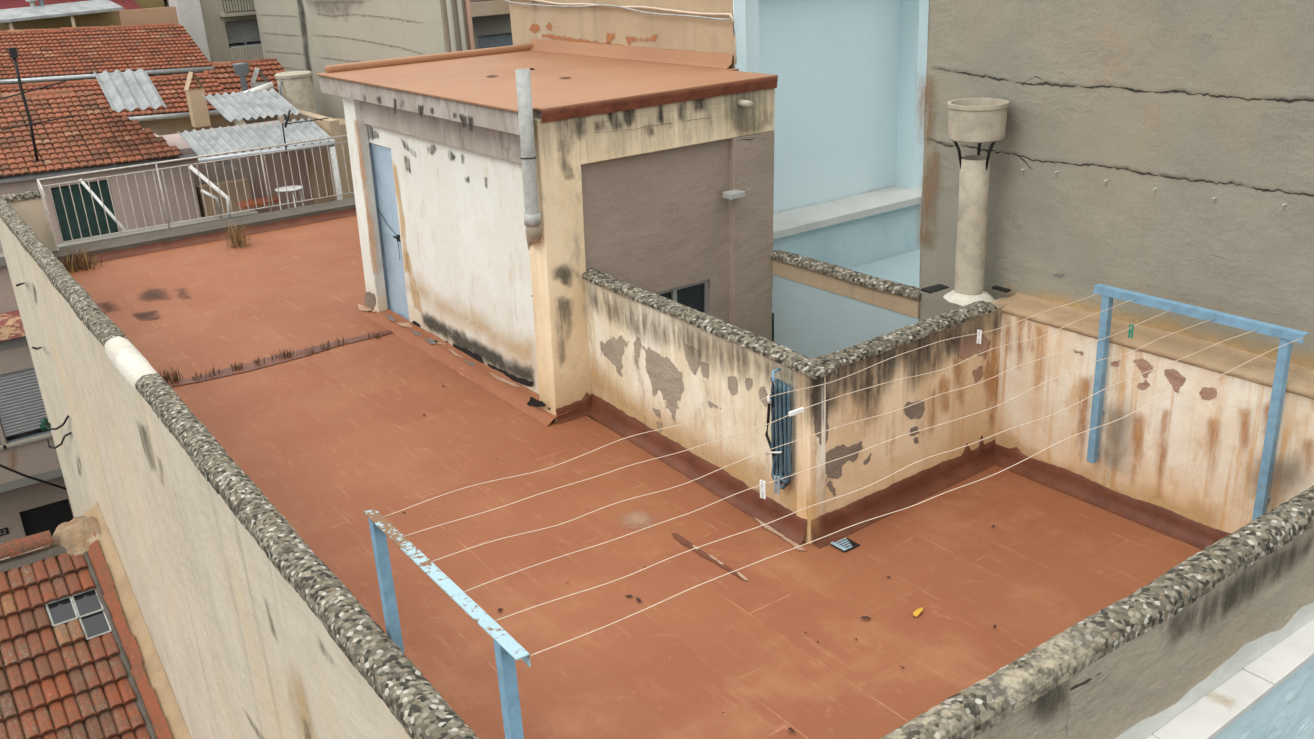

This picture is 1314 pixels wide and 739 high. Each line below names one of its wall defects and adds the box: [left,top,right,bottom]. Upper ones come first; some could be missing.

crack [932,58,1314,103]
crack [924,130,1314,196]
leakage [423,315,533,381]
peeling [600,335,709,434]
peeling [728,376,768,407]
peeling [809,375,872,495]
rust [1079,380,1089,440]
rust [1134,418,1142,454]
peeling [1110,359,1186,393]
peeling [1199,387,1217,400]